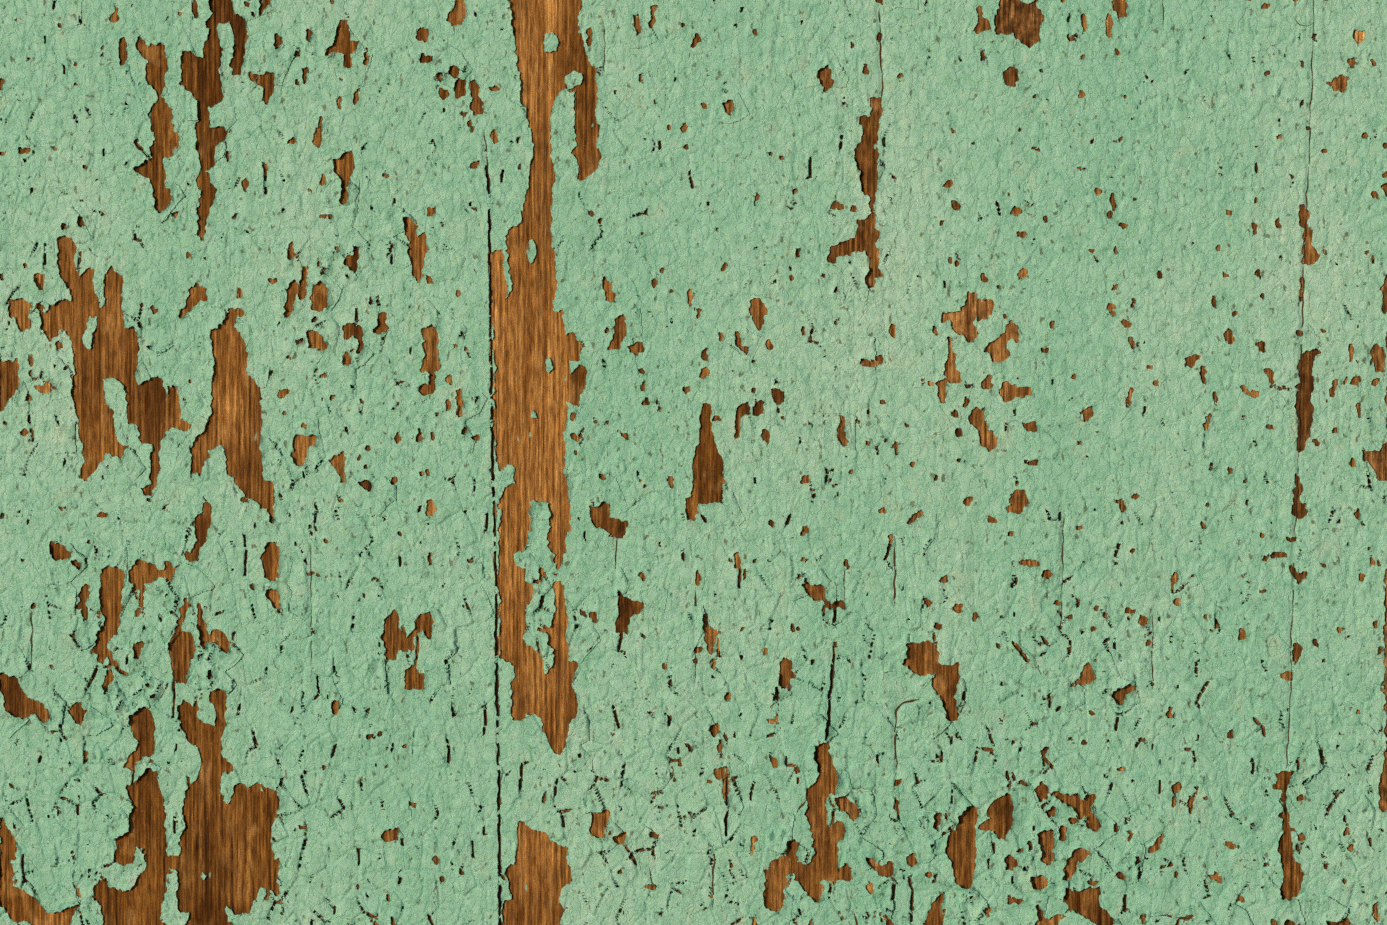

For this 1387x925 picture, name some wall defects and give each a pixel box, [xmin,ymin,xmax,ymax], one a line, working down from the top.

peeling [820,97,899,325]
peeling [0,199,398,925]
peeling [100,0,668,854]
crack [484,135,502,925]
peeling [667,370,806,586]
crack [891,536,899,604]
peeling [808,266,1060,467]
crack [772,687,780,715]
crack [823,654,838,743]
crack [894,699,919,768]
peeling [432,821,572,925]
crack [712,772,730,909]